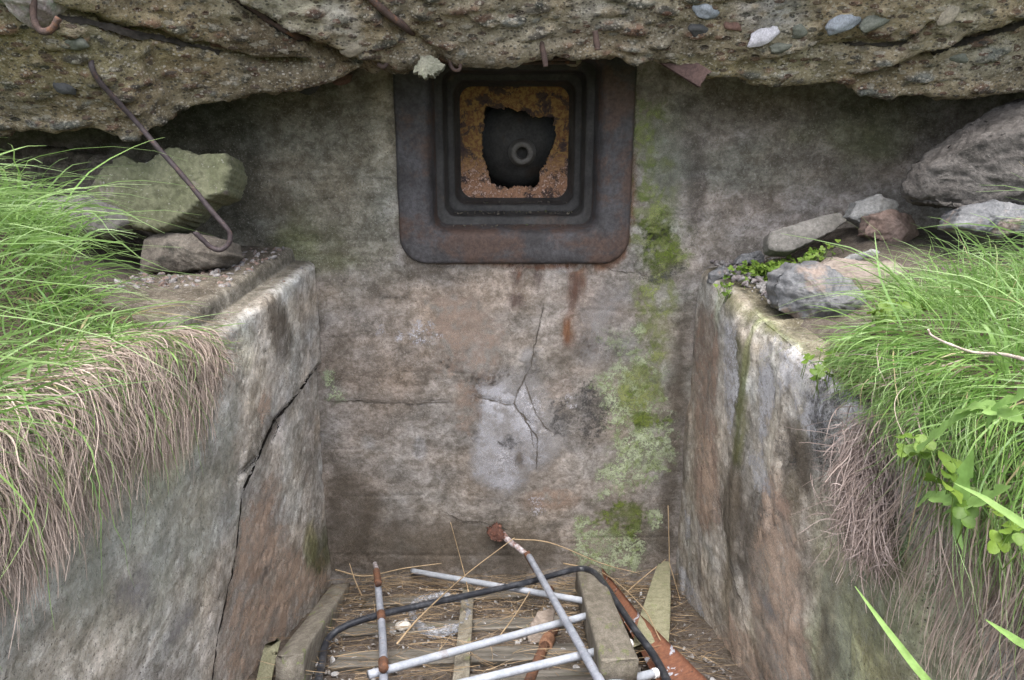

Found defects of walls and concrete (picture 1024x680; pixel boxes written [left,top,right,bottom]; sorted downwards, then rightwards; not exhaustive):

crack [212,314,321,680]
damp [479,386,544,488]
crack [474,304,555,468]